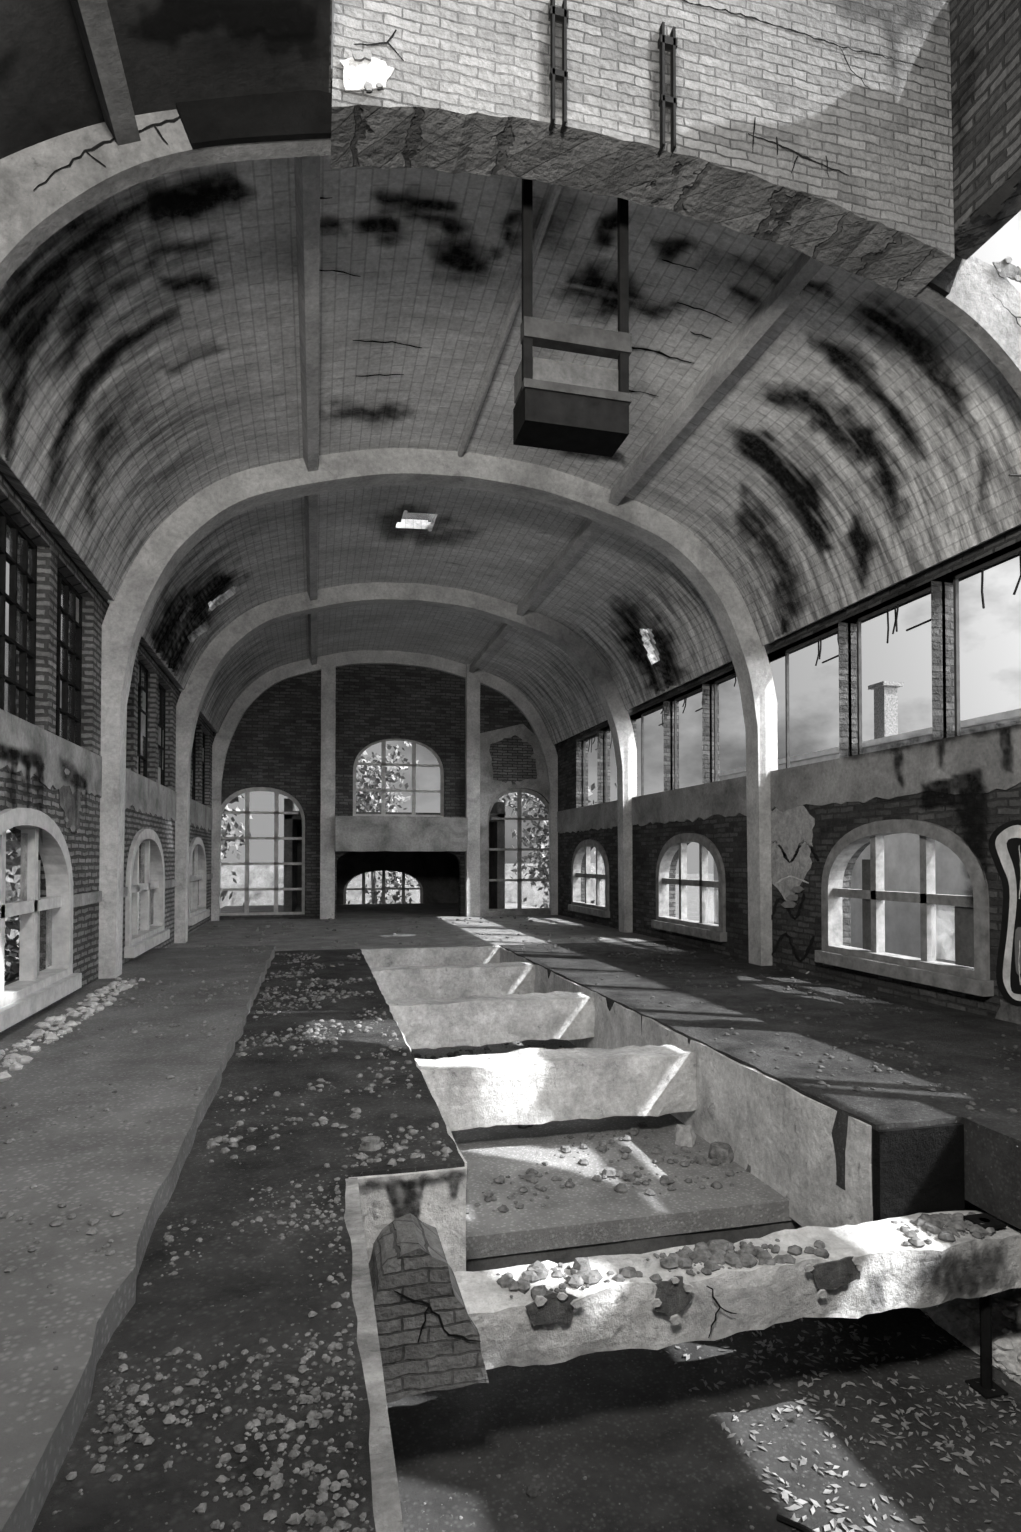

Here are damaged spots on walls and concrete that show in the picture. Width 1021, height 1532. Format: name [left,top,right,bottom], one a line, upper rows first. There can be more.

damp [320,191,465,245]
spalling [992,257,1021,283]
damp [0,171,253,503]
damp [734,429,831,551]
damp [767,388,903,522]
damp [812,340,923,455]
damp [858,300,965,413]
damp [979,458,987,500]
damp [737,489,801,637]
damp [847,516,873,588]